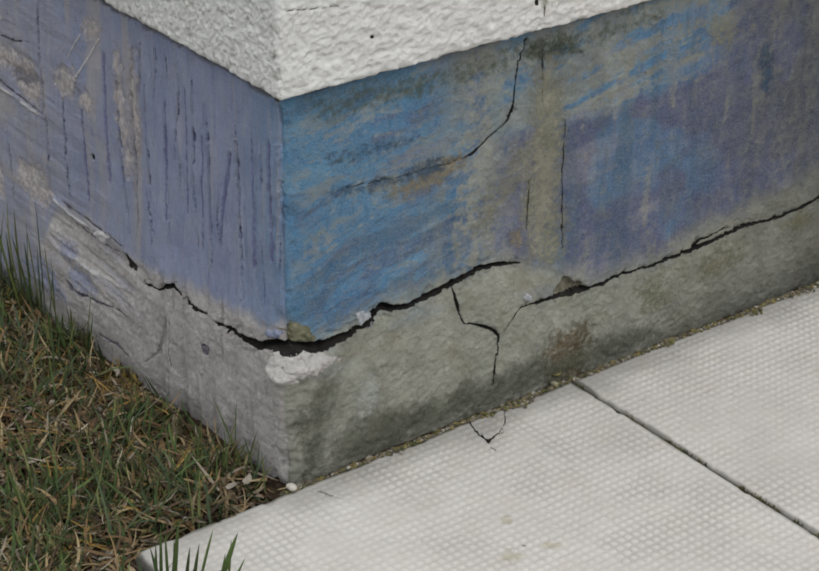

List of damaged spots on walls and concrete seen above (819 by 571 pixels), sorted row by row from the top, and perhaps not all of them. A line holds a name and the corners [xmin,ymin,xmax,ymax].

crack [335,38,544,193]
crack [559,119,567,248]
peeling [265,329,285,338]
spalling [261,349,341,386]
crack [145,196,819,384]
damp [544,321,592,383]